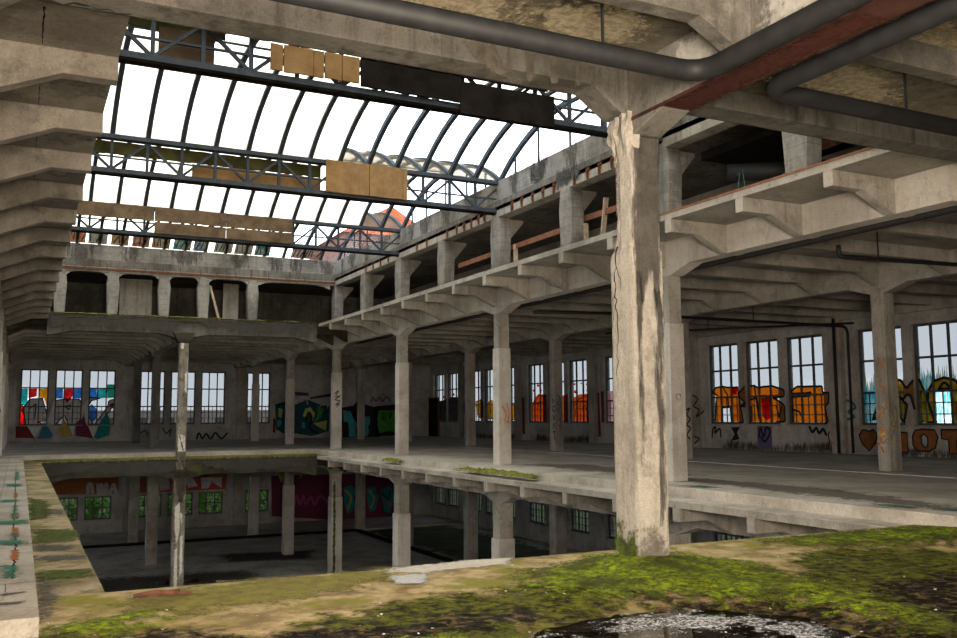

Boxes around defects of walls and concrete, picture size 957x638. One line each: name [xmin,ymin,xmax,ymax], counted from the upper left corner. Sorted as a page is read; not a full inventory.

crack [42,0,132,44]
rust [572,157,614,185]
rust [510,182,556,211]
crack [612,247,621,380]
water stain [640,529,675,557]